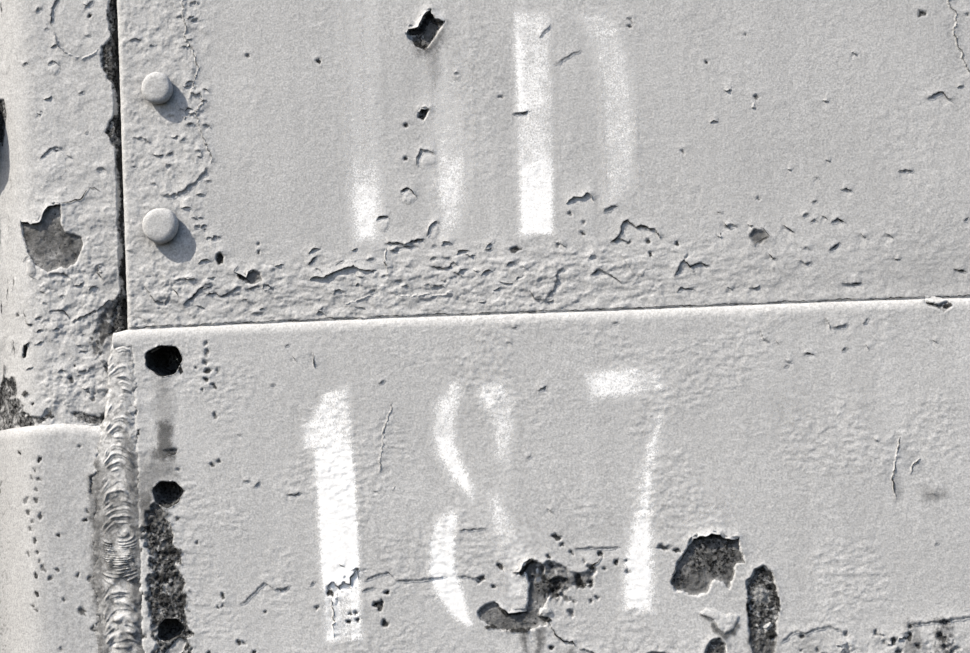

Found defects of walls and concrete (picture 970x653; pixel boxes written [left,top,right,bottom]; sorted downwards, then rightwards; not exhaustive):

peeling [402,6,446,50]
peeling [8,187,98,278]
crack [306,239,423,280]
crack [563,186,660,283]
crack [674,241,709,291]
peeling [478,551,618,632]
peeling [670,526,745,595]
spalling [165,631,194,653]